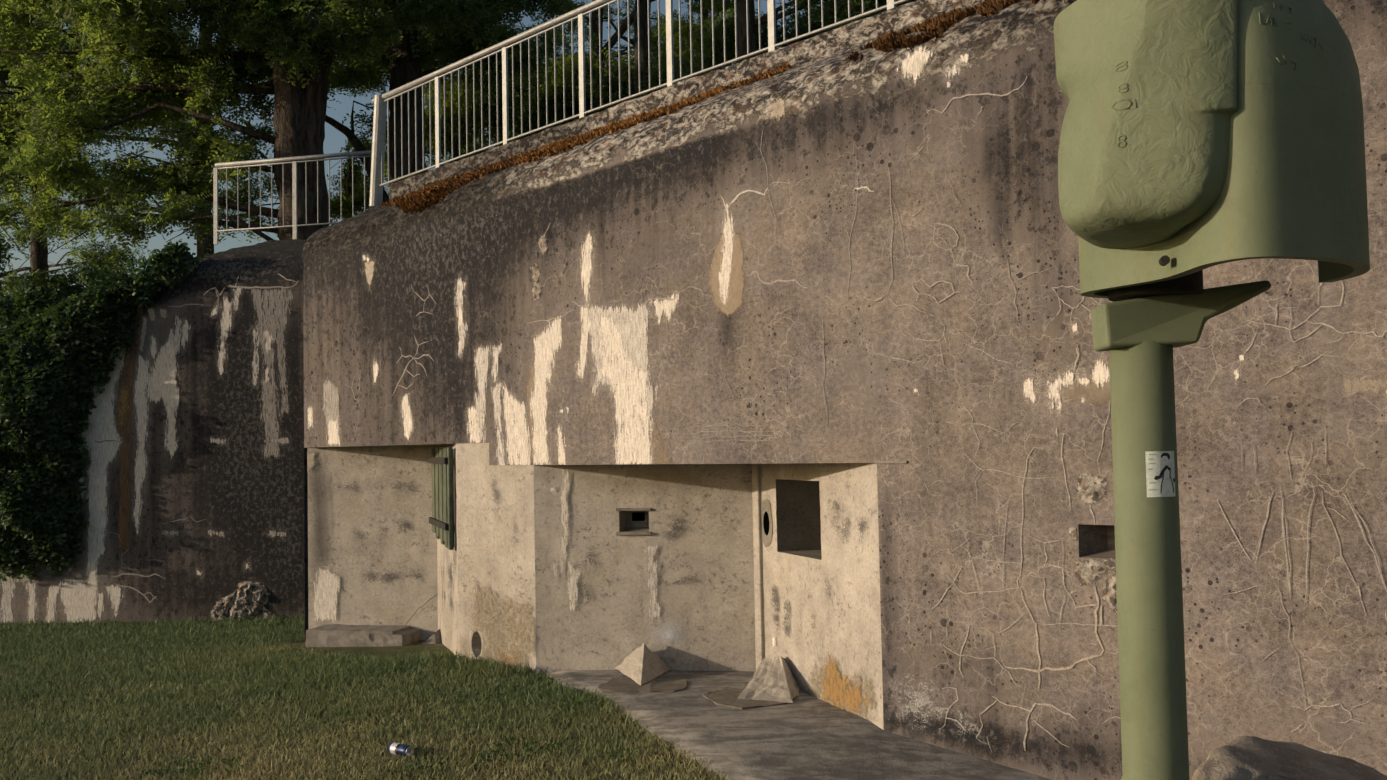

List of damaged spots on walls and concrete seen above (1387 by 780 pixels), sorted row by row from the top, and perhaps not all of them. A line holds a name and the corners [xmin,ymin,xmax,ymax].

crack [721,131,793,224]
crack [392,286,436,396]
crack [1219,281,1387,419]
crack [746,77,1121,751]
spalling [1076,474,1107,504]
crack [1241,426,1387,620]
spalling [210,581,272,621]
rust [803,652,876,719]
spalling [1074,558,1117,612]
crack [1268,571,1368,732]